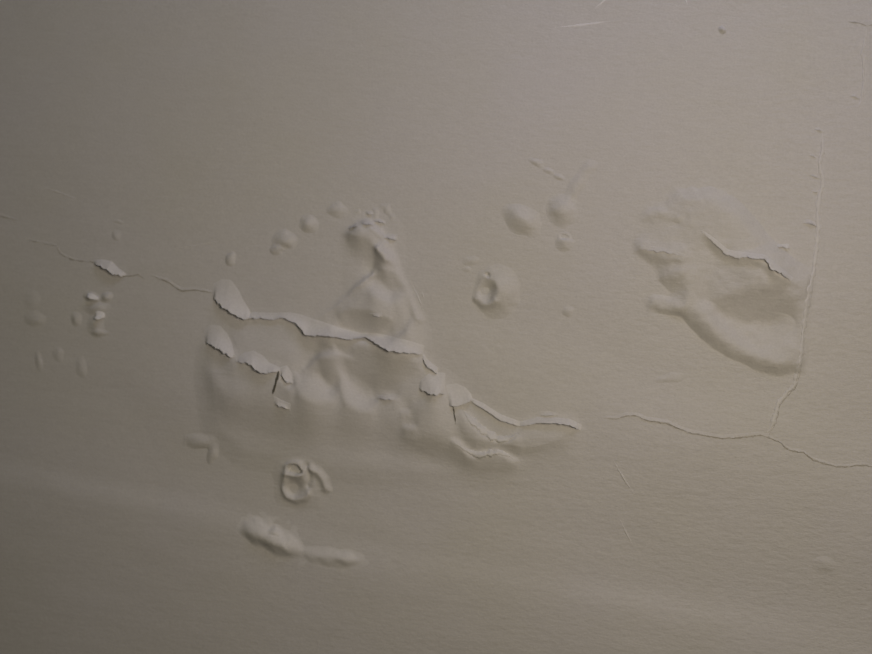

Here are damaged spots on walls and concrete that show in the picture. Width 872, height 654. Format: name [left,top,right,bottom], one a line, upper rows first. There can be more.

crack [27,239,212,293]
peeling [193,209,588,492]
crack [603,412,872,468]